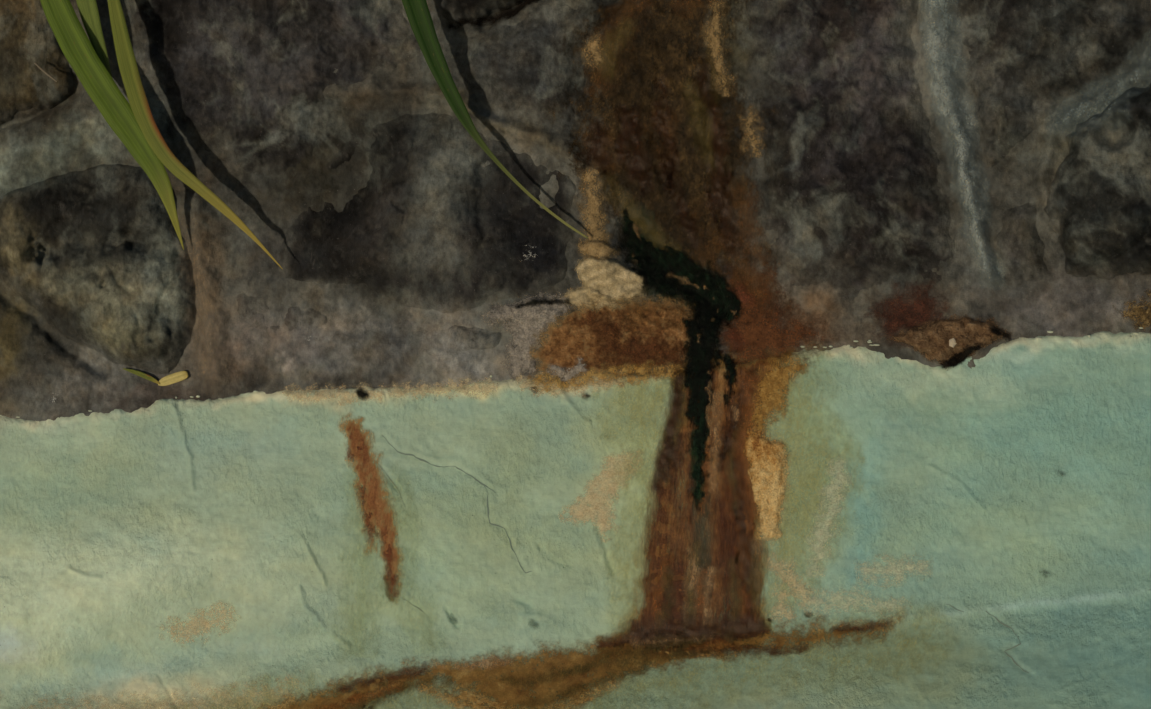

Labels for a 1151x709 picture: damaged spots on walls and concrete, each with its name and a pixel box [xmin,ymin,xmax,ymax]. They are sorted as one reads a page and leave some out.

rust [339,415,403,597]
water stain [483,0,790,380]
rust [530,272,830,655]
spalling [849,314,1010,368]